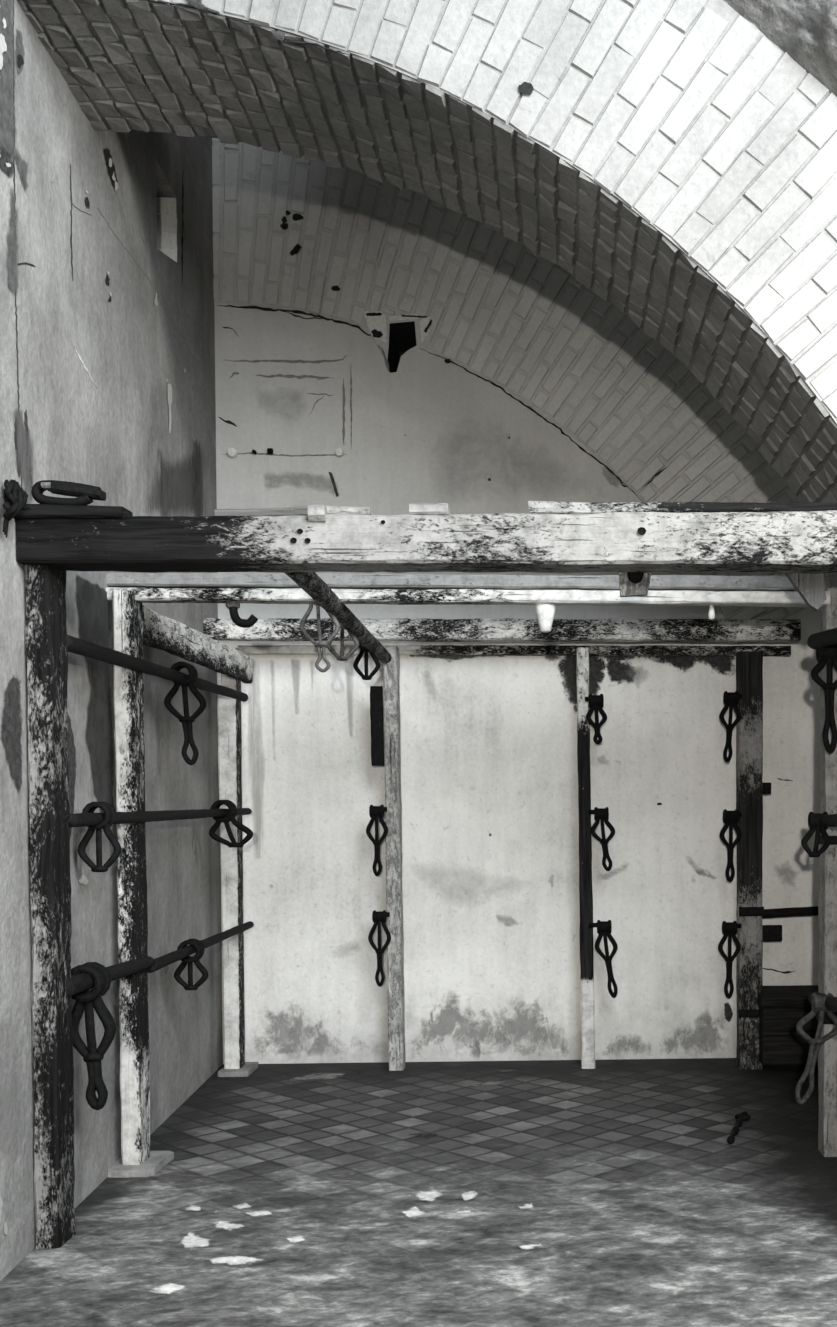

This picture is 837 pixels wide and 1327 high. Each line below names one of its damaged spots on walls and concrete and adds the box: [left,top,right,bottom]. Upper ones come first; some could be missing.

peeling [0,143,14,177]
water stain [0,0,28,293]
water stain [257,1013,329,1053]
water stain [418,997,565,1056]
water stain [666,1003,733,1051]